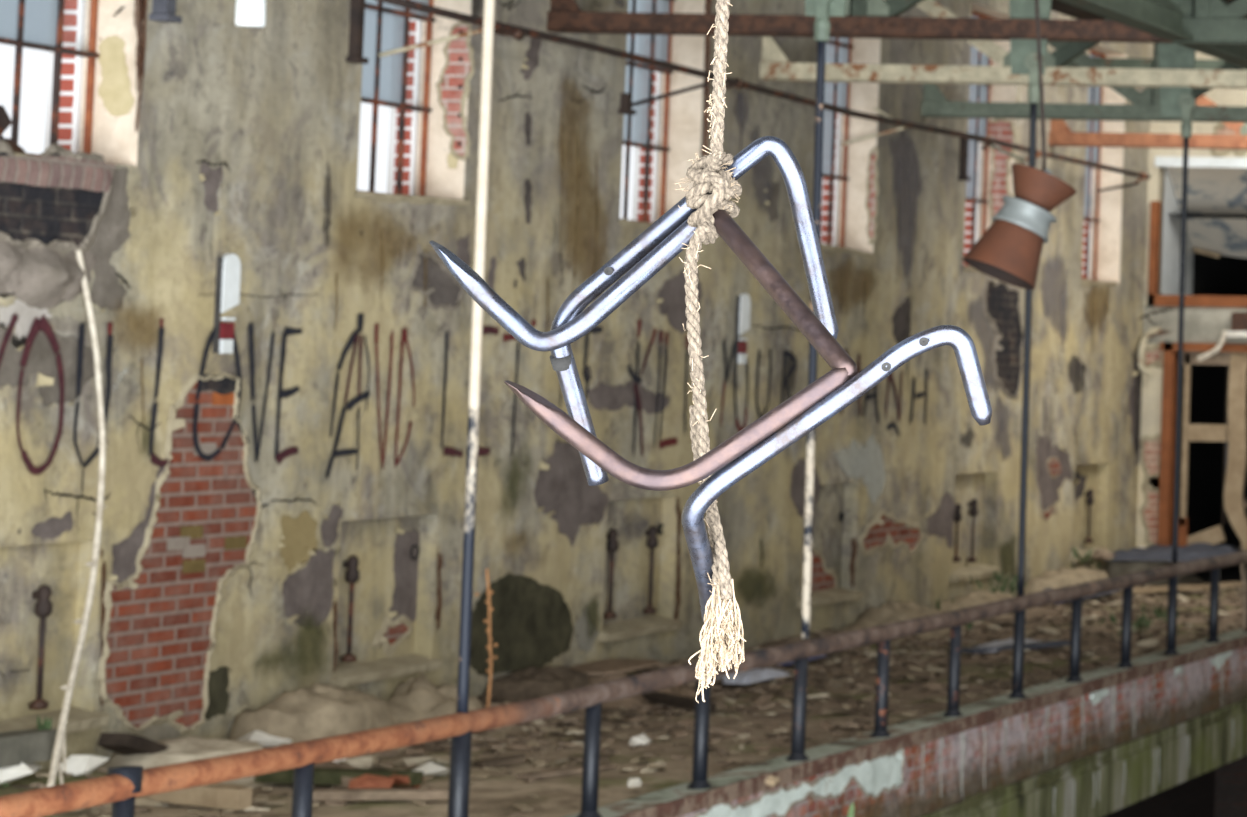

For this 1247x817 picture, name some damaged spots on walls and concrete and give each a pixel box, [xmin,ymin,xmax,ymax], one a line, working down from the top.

flaking render [435,22,475,169]
flaking render [0,141,136,312]
flaking render [98,372,262,734]
peeling [278,501,343,628]
water stain [470,574,573,676]
flaking render [859,492,956,557]
peeling [1036,434,1087,522]
peeling [694,748,905,817]